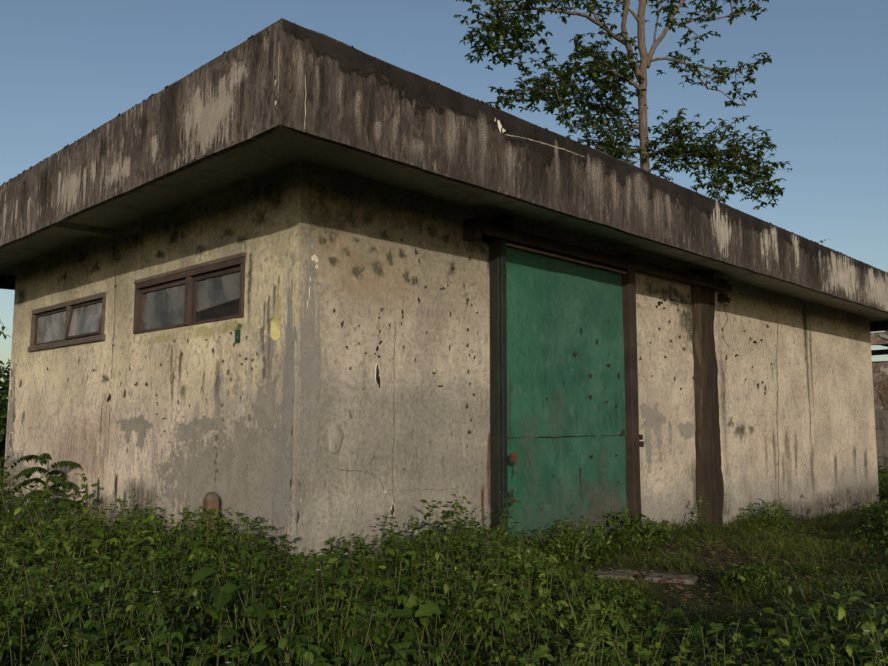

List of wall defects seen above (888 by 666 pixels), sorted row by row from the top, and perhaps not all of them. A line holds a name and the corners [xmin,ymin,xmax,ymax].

leakage [628,175,670,222]
leakage [374,250,405,274]
leakage [646,284,693,340]
spalling [346,308,404,391]
peeling [116,394,166,461]
peeling [154,235,326,573]
crack [334,323,462,526]
peeling [640,403,696,473]
leakage [722,365,754,434]